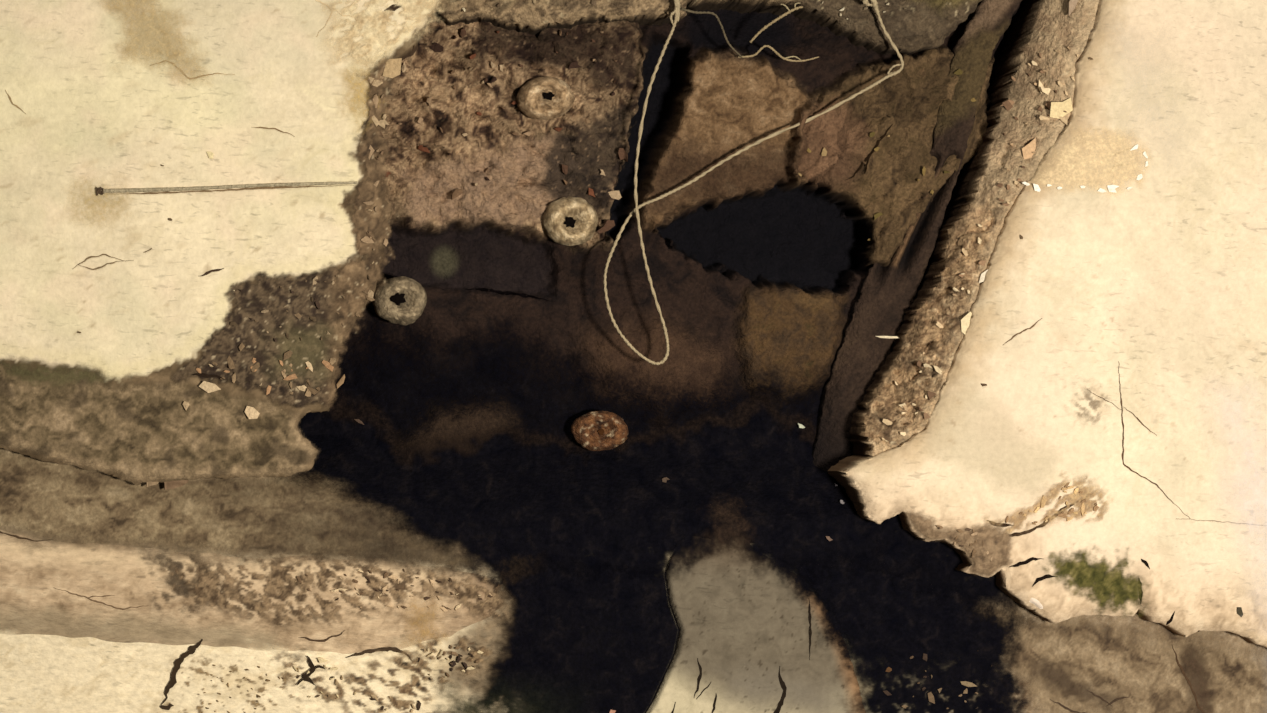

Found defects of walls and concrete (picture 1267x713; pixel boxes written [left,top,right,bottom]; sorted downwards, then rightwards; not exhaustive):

spalling [171,0,1148,460]
crack [1091,361,1266,526]
water stain [0,317,1267,713]
spalling [908,481,1107,576]
peeling [161,555,507,626]
crack [806,600,814,660]
peeling [160,636,492,713]
crack [671,661,717,713]
crack [774,668,787,713]